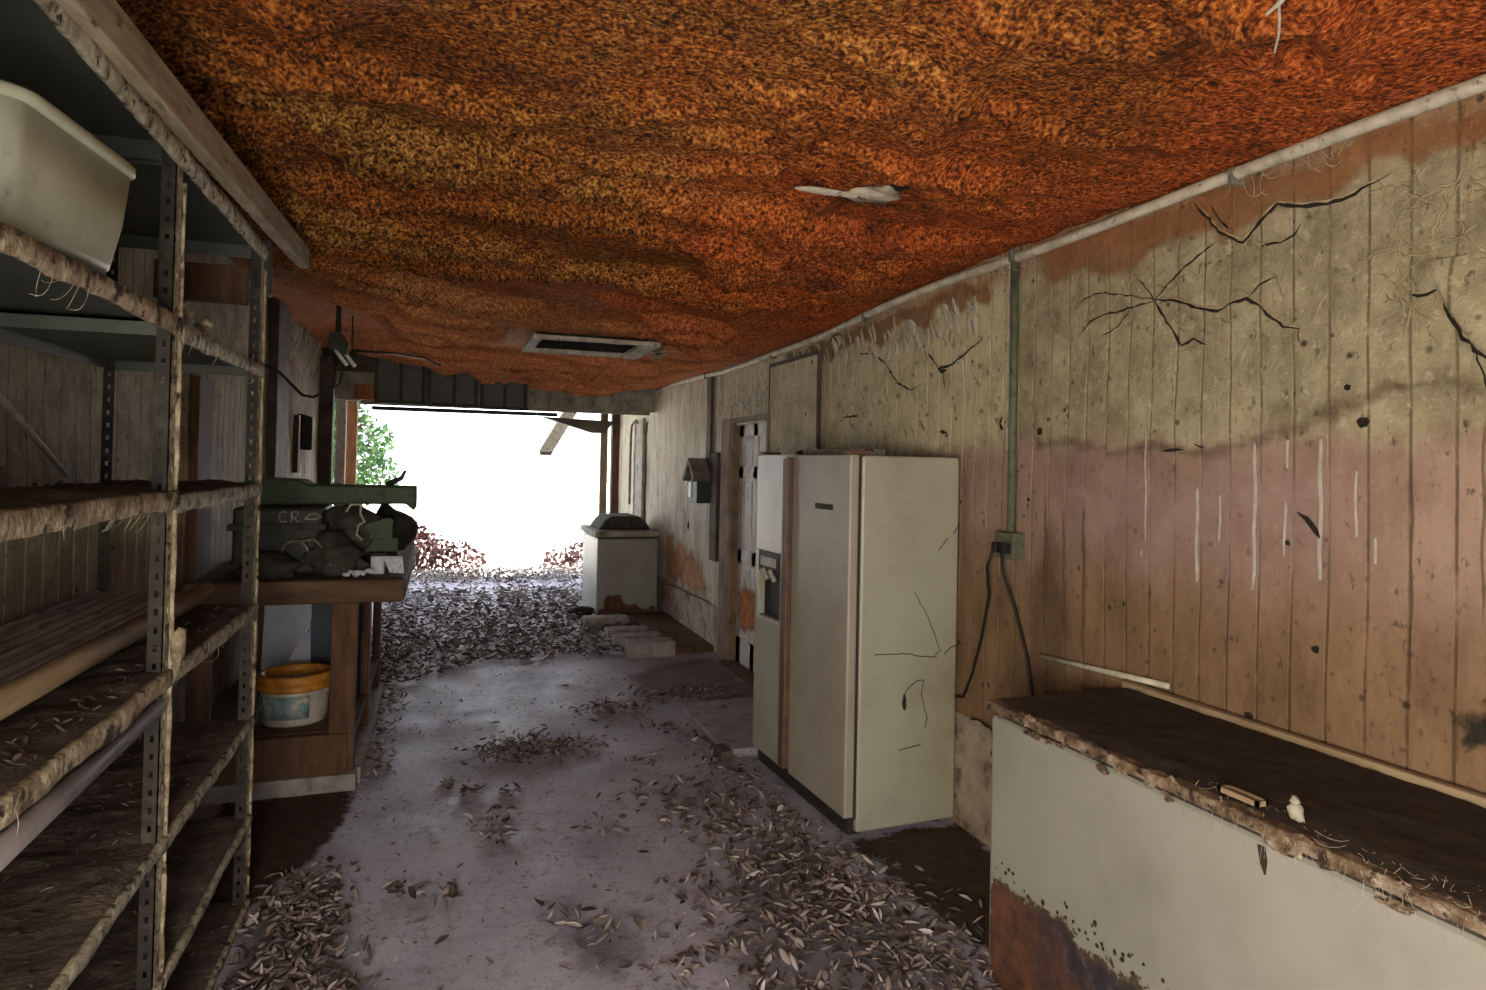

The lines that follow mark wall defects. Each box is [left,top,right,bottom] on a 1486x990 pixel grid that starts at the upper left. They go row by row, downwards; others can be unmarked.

crack [1072,169,1393,346]
crack [860,340,981,390]
mould [1459,715,1486,748]
corrosion [989,862,1168,990]